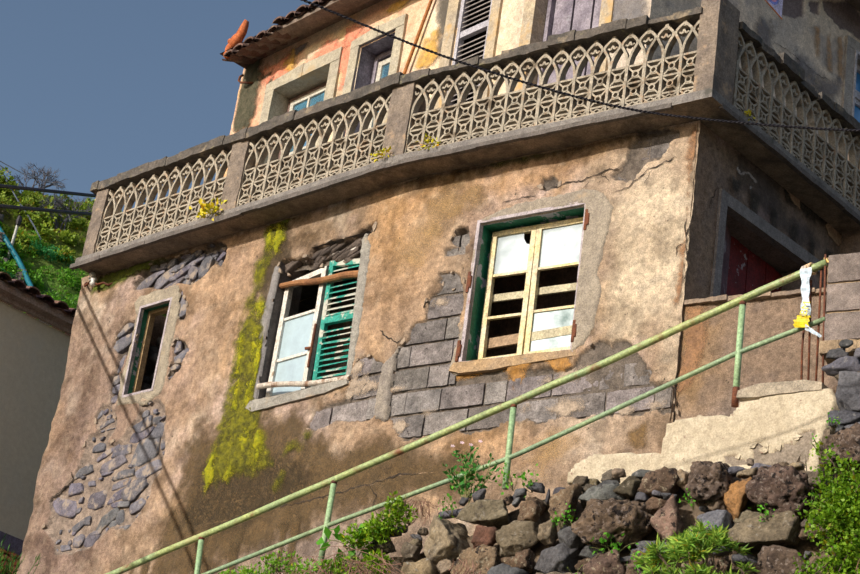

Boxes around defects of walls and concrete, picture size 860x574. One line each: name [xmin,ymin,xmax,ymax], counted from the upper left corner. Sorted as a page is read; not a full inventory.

crack [501,157,674,204]
spalling [137,244,227,320]
leakage [261,225,300,318]
spalling [277,221,378,280]
spalling [445,230,470,257]
spalling [167,337,189,380]
spalling [309,354,383,431]
spalling [390,271,680,438]
spalling [53,320,166,552]
peeling [725,430,820,466]